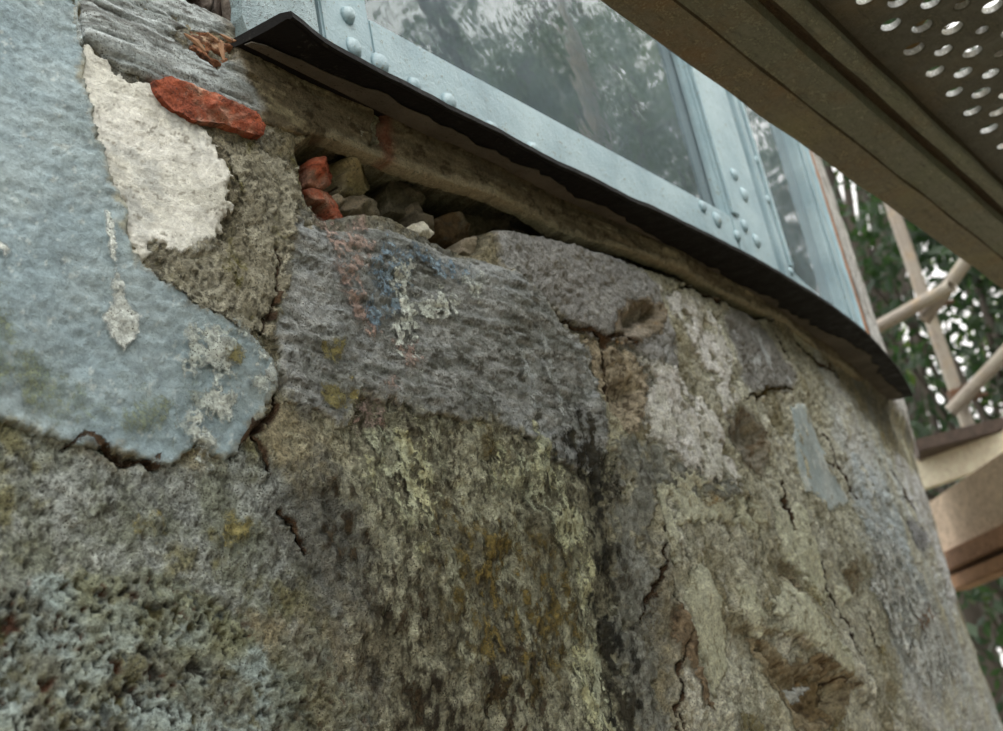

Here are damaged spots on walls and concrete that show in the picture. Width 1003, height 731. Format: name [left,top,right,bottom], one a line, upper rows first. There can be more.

peeling [0,0,311,470]
crack [555,312,638,393]
crack [63,430,162,472]
crack [780,480,795,530]
crack [821,432,858,500]
crack [639,515,675,620]
crack [672,628,695,731]